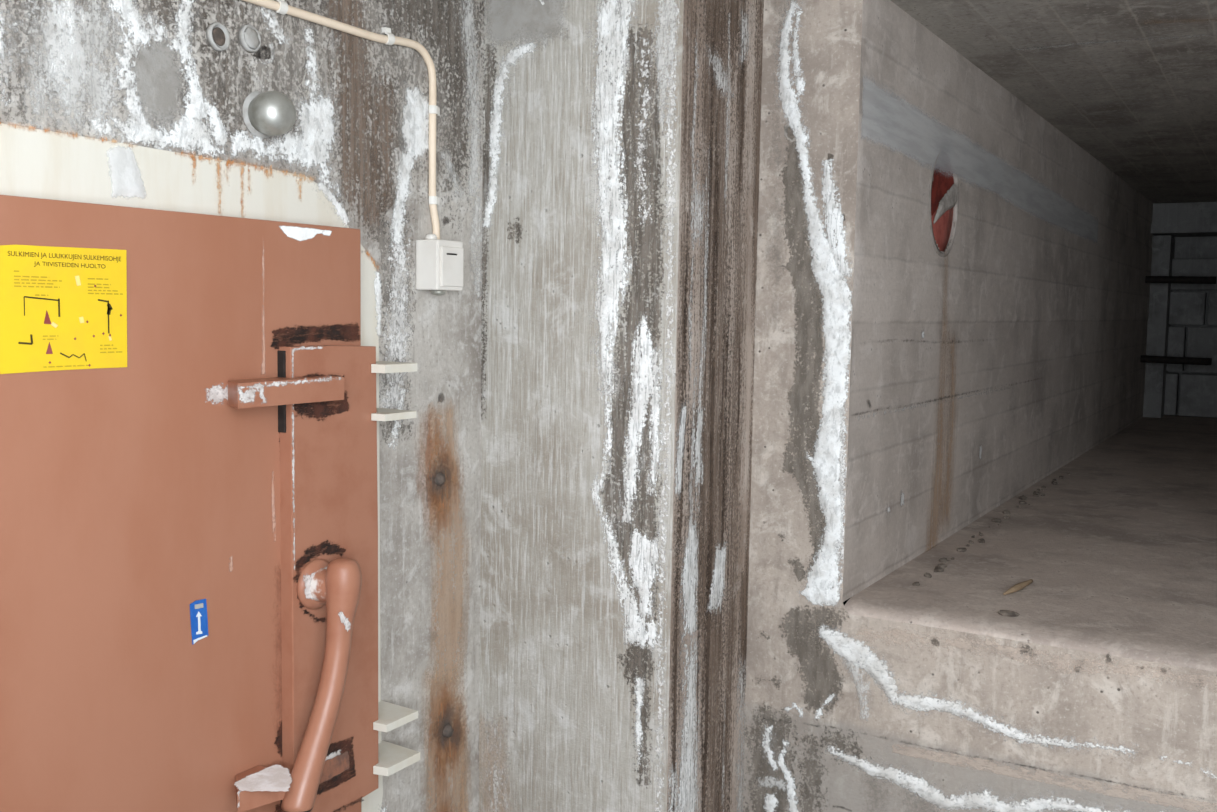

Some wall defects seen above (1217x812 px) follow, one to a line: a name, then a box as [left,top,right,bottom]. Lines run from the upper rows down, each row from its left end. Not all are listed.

leakage [0,0,536,449]
rust [425,409,508,812]
leakage [591,0,1133,812]